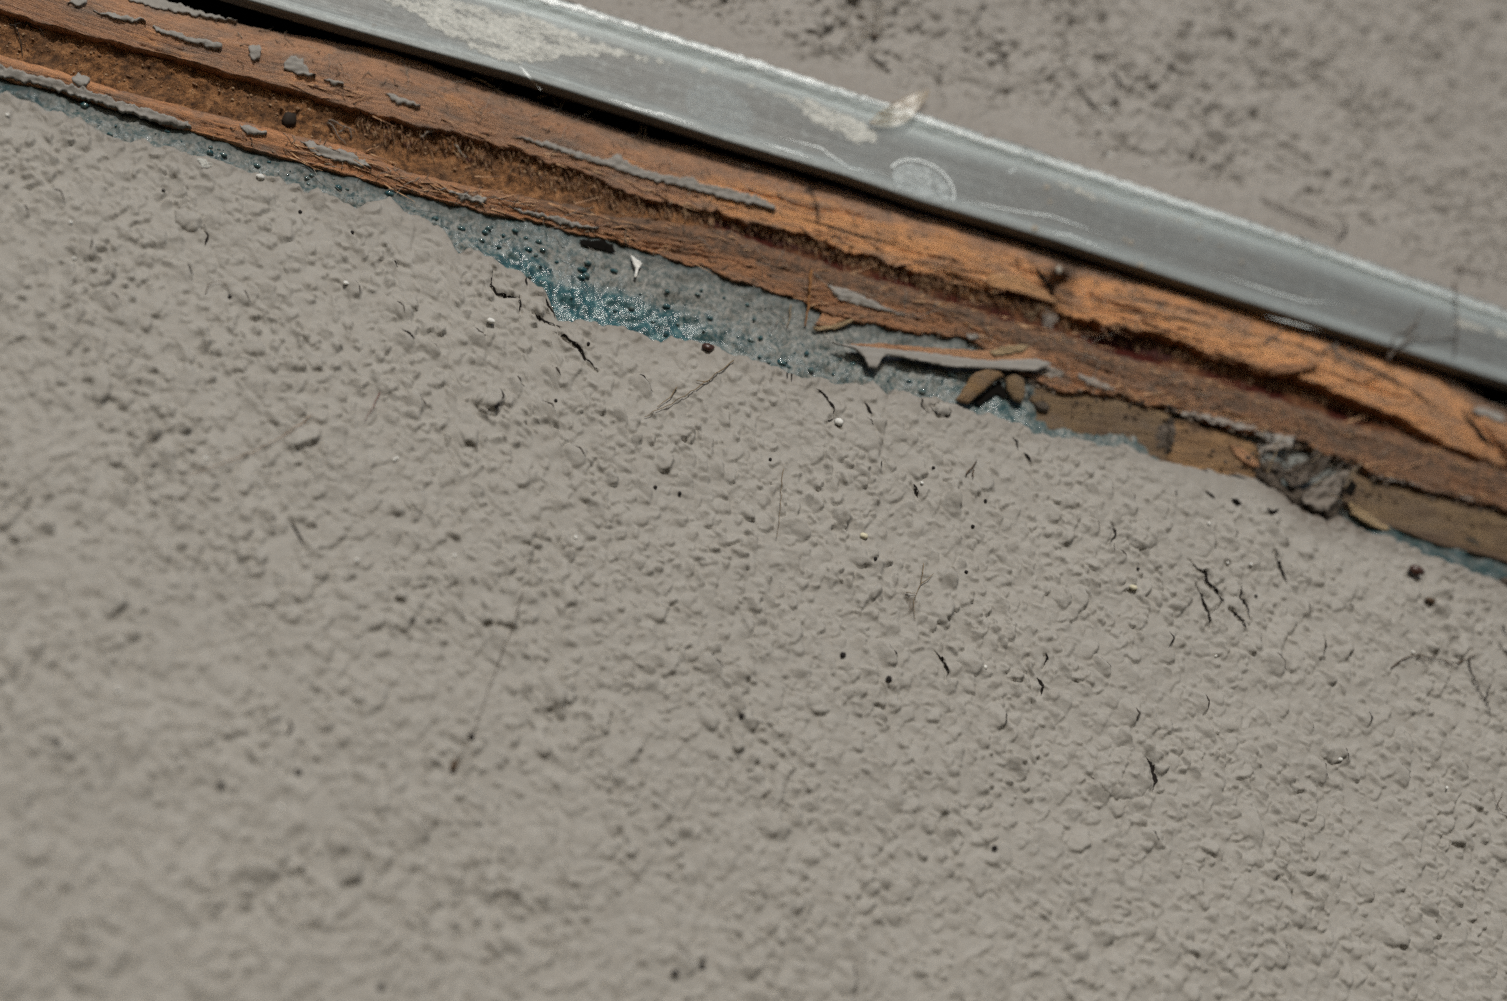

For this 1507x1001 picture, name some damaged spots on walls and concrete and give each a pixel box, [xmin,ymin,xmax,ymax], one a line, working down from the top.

peeling [67,0,237,51]
peeling [284,56,344,87]
peeling [0,64,191,129]
peeling [386,93,421,109]
peeling [239,124,267,136]
peeling [300,140,372,169]
peeling [514,136,776,212]
peeling [507,205,599,230]
peeling [828,285,905,316]
peeling [1030,365,1115,390]
peeling [1177,410,1295,447]
peeling [1471,406,1506,423]